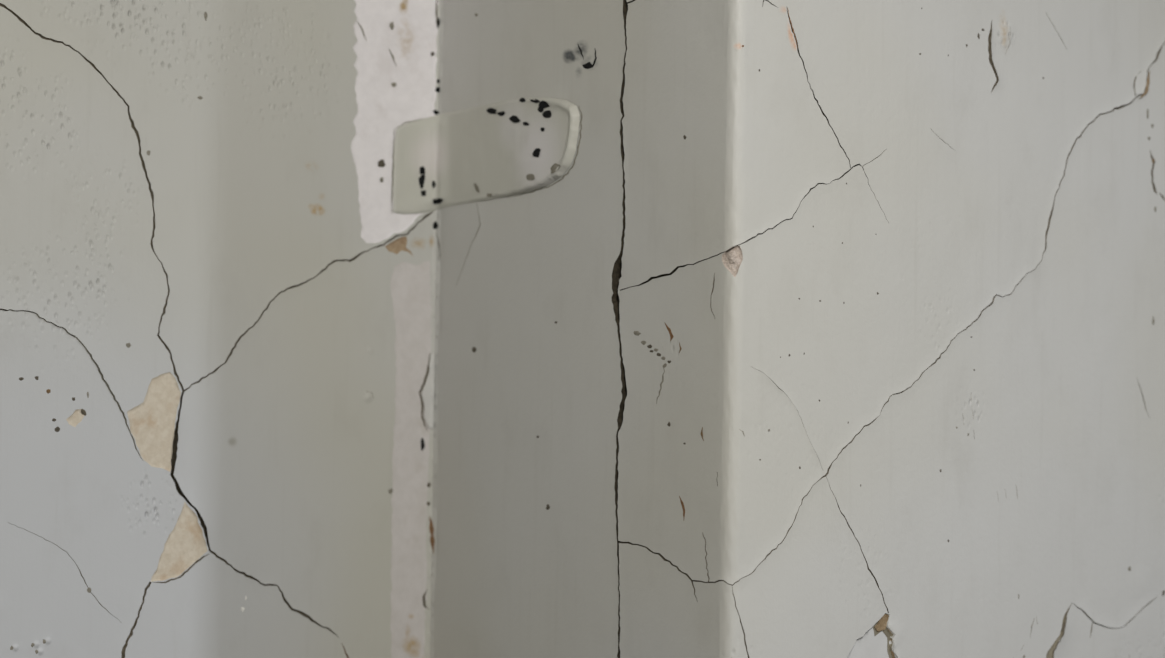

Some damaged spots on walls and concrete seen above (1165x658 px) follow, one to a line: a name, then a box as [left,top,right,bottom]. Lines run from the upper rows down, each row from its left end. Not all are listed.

damp [486,98,551,132]
damp [561,39,600,79]
flaking render [0,309,181,472]
crack [0,3,434,658]
peeling [351,0,439,658]
crack [620,0,1165,658]
flaking render [151,502,209,583]
peeling [847,613,898,658]